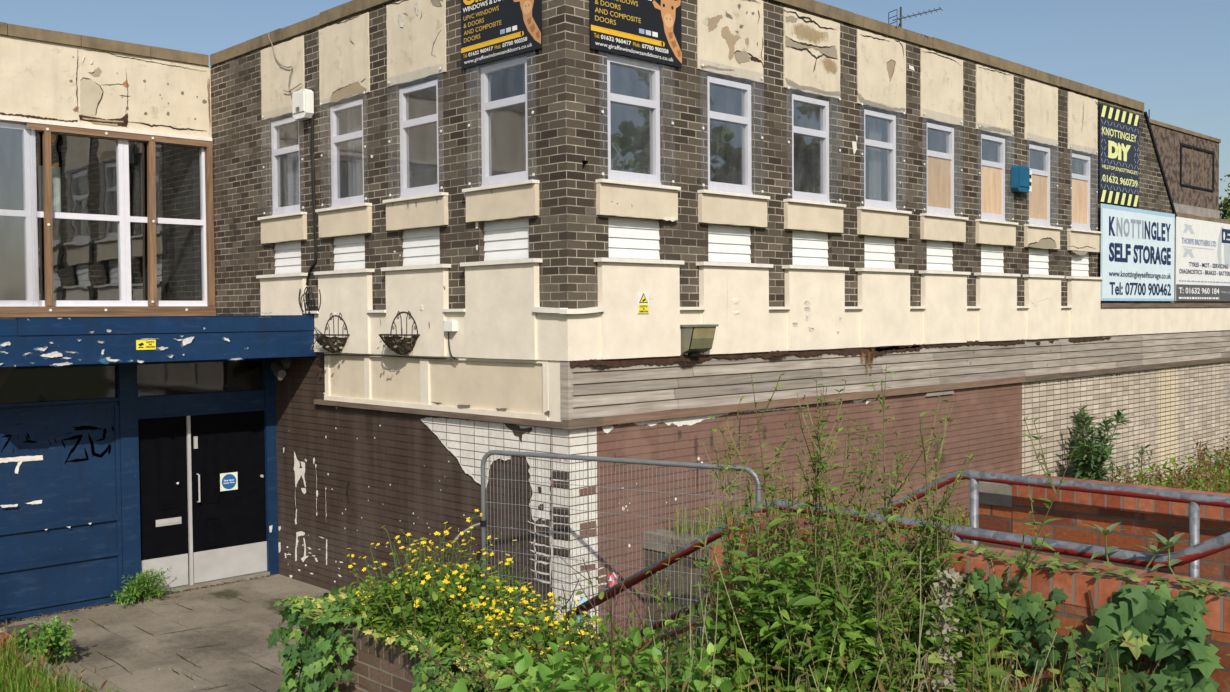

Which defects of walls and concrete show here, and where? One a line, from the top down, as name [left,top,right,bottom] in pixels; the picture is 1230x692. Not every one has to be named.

crack [76,50,207,131]
spalling [330,78,366,102]
flaking render [700,14,761,71]
spalling [785,37,838,59]
crack [736,0,1012,76]
spalling [886,59,896,81]
peeling [0,329,144,367]
peeling [140,327,206,358]
peeling [269,448,343,583]
peeling [420,402,572,588]